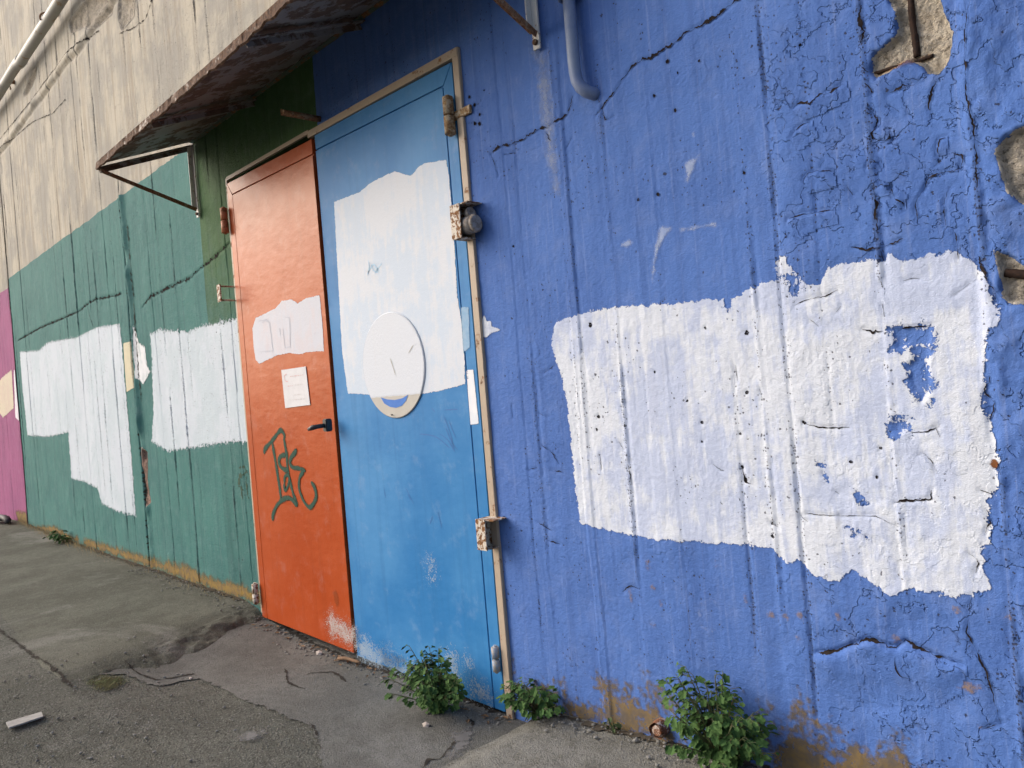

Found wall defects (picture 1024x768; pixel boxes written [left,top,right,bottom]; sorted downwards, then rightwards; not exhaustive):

crack [601,0,738,121]
spalling [872,0,954,78]
crack [493,96,573,173]
crack [849,3,996,334]
spalling [994,126,1024,204]
spalling [993,250,1024,305]
crack [4,209,226,560]
leakage [16,510,260,602]
leakage [756,694,909,768]